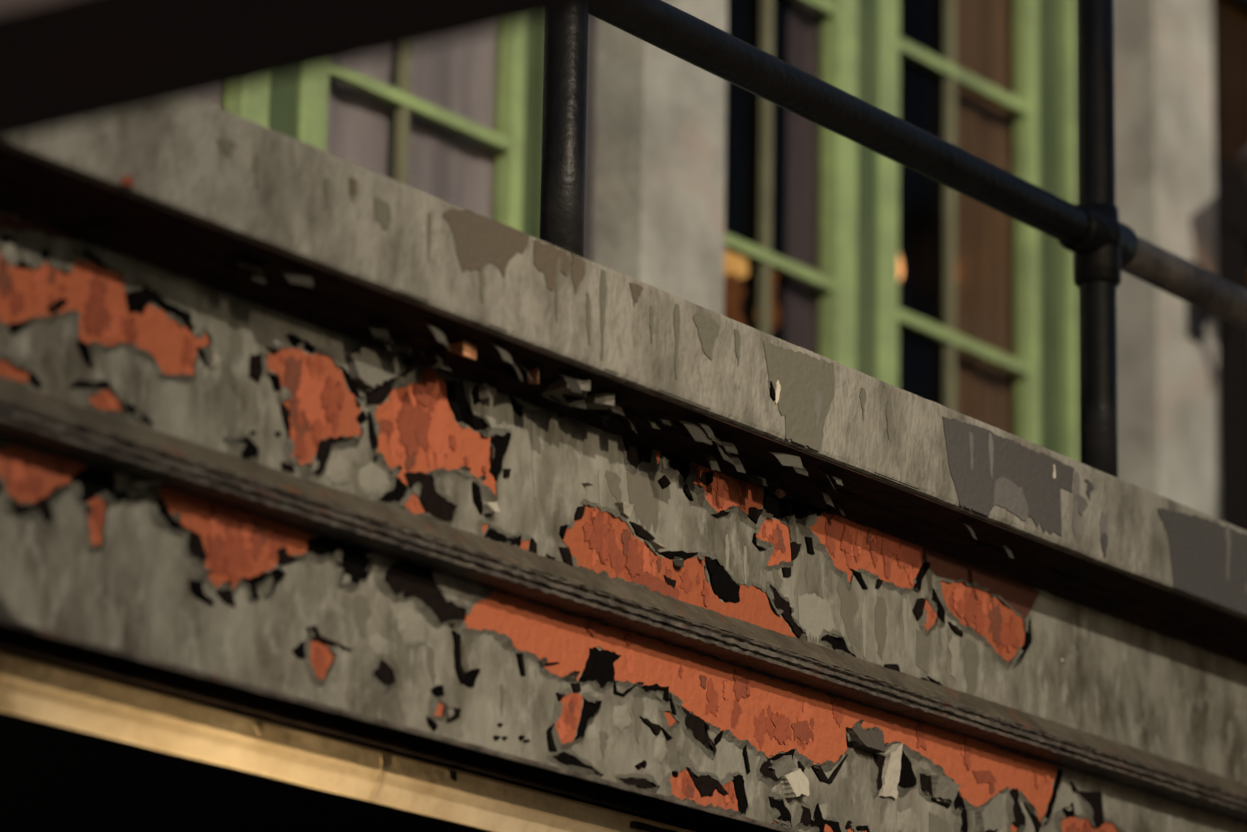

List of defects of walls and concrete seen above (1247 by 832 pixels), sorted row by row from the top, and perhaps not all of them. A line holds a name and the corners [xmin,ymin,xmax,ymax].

peeling [0,445,372,607]
spalling [236,431,259,459]
peeling [249,321,1040,665]
peeling [292,625,342,680]
spalling [373,658,396,687]
peeling [384,560,1121,832]